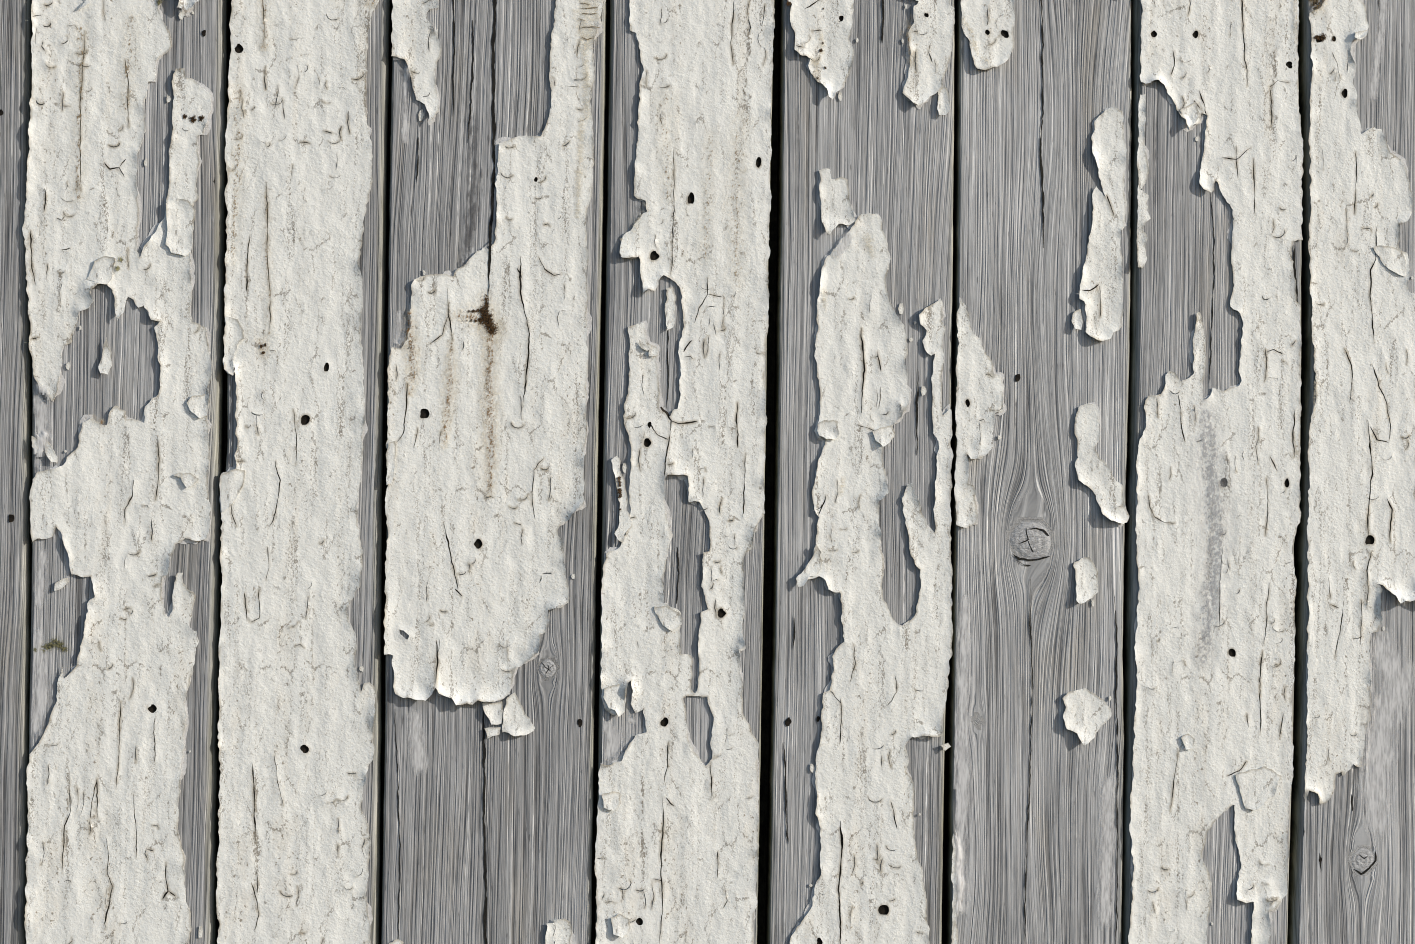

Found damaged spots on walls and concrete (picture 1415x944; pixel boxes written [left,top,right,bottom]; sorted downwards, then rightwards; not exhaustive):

peeling [22,0,858,944]
rust [458,294,499,492]
peeling [790,168,1007,944]
peeling [902,0,1015,115]
peeling [1063,688,1112,746]
peeling [1072,0,1415,944]